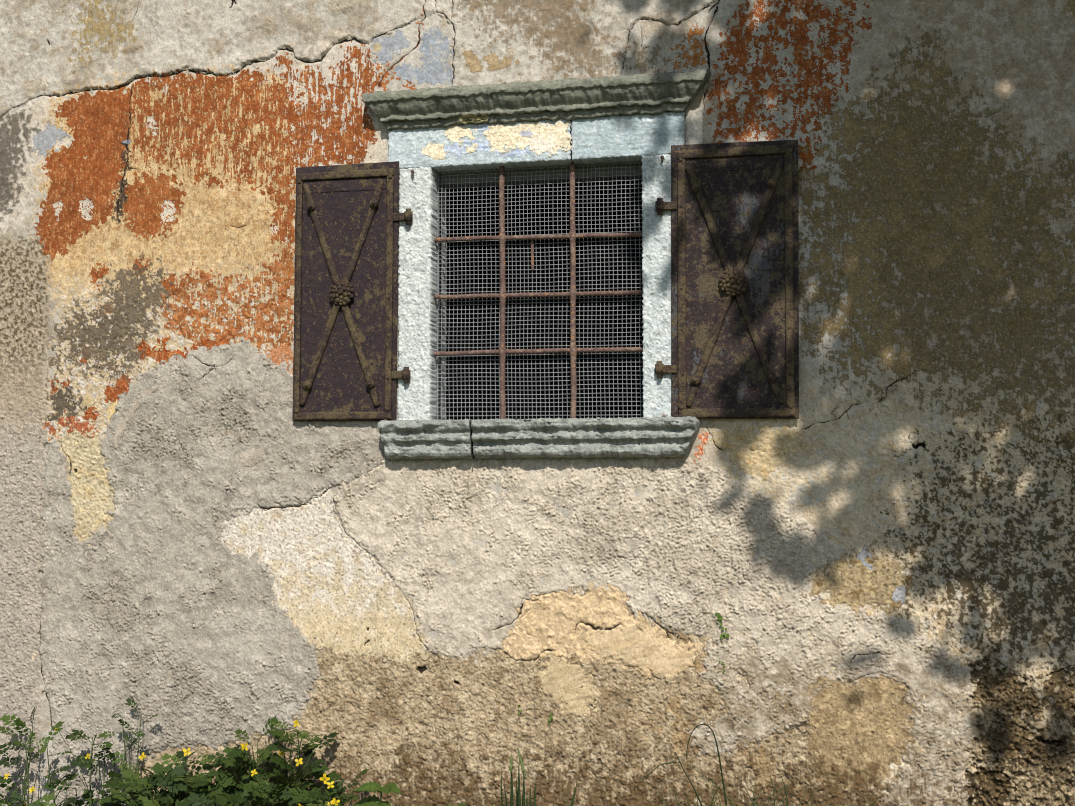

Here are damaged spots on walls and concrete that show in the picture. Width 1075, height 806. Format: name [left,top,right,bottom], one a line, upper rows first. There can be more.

crack [0,0,455,215]
peeling [29,14,519,376]
peeling [422,114,572,160]
crack [620,0,720,114]
peeling [664,0,872,179]
crack [802,370,923,430]
leakage [798,29,1075,679]
crack [257,487,438,657]
spalling [499,582,706,678]
leakage [992,682,1075,806]